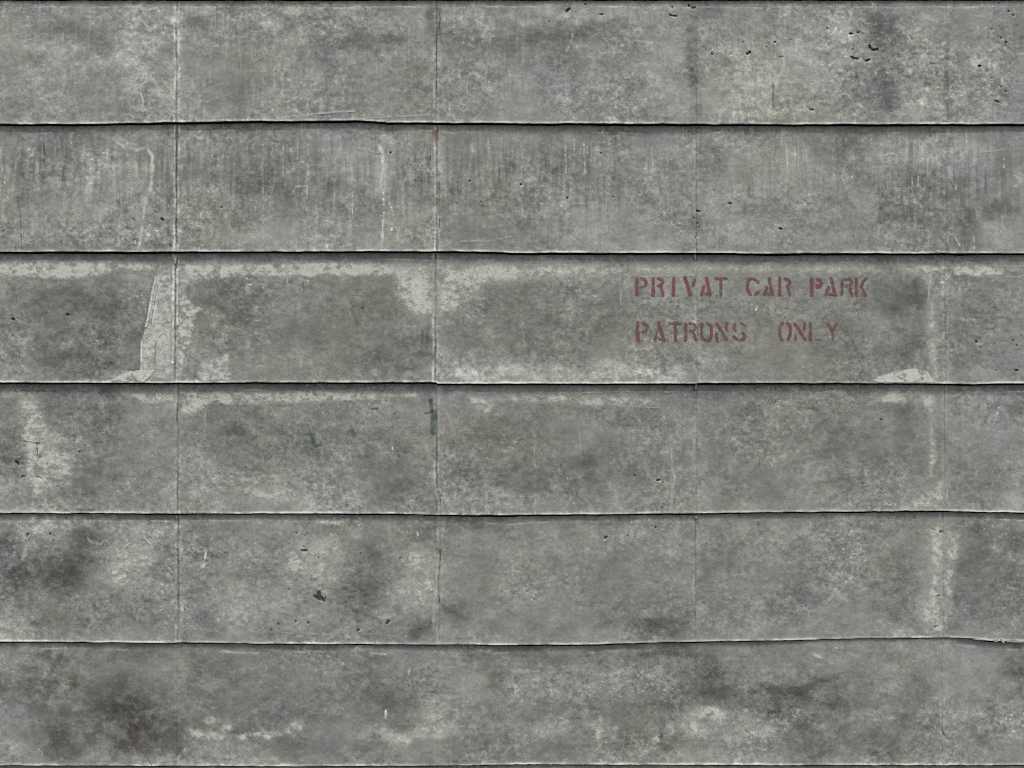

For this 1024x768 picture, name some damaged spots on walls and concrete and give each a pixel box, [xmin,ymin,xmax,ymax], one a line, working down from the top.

peeling [142,326,172,381]
damp [0,140,875,364]